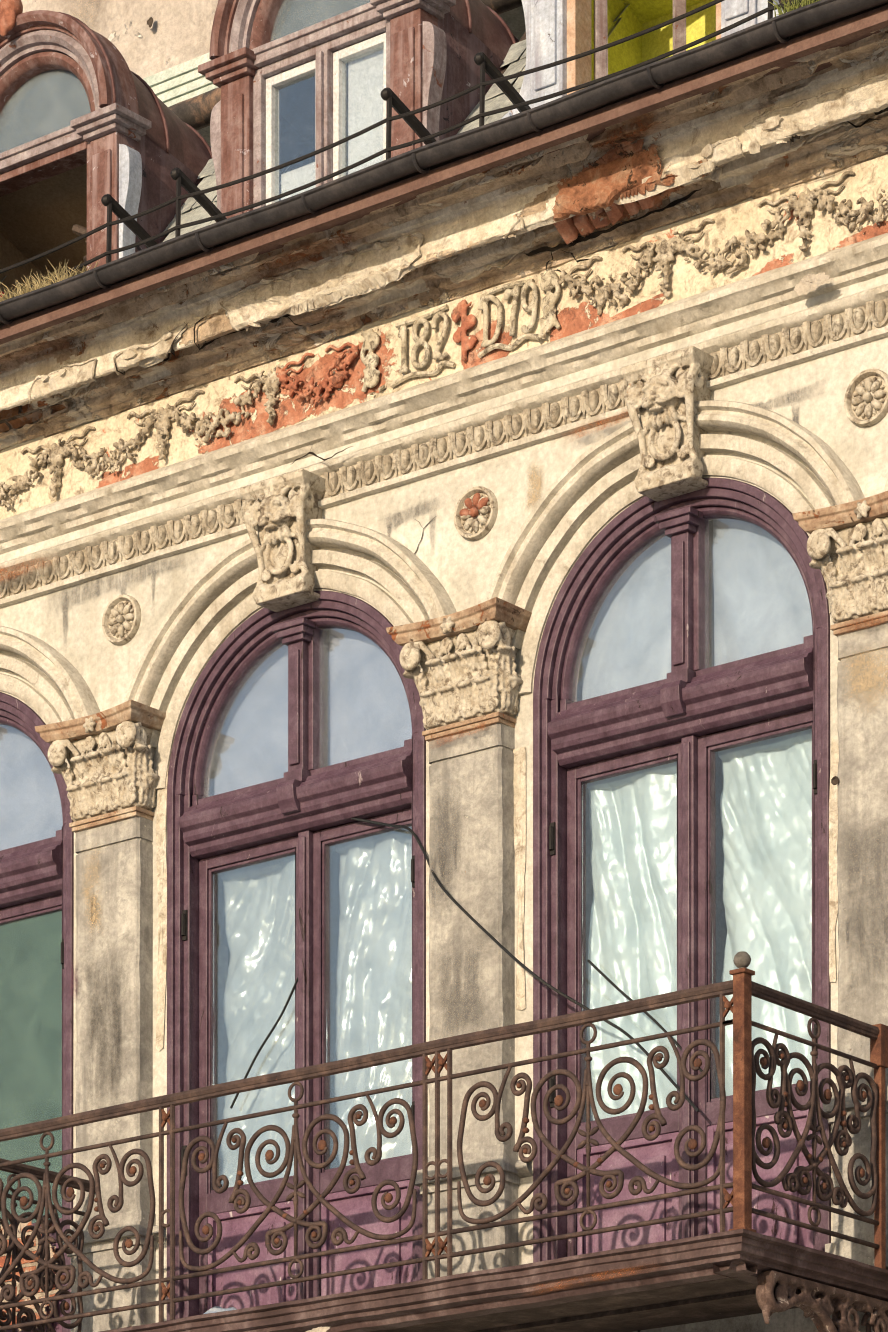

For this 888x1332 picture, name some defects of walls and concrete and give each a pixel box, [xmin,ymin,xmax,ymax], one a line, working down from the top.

spalling [552,73,888,250]
crack [524,188,702,272]
peeling [113,322,187,375]
flaking render [461,320,513,369]
peeling [0,358,97,439]
flaking render [187,333,399,454]
flaking render [95,456,160,489]